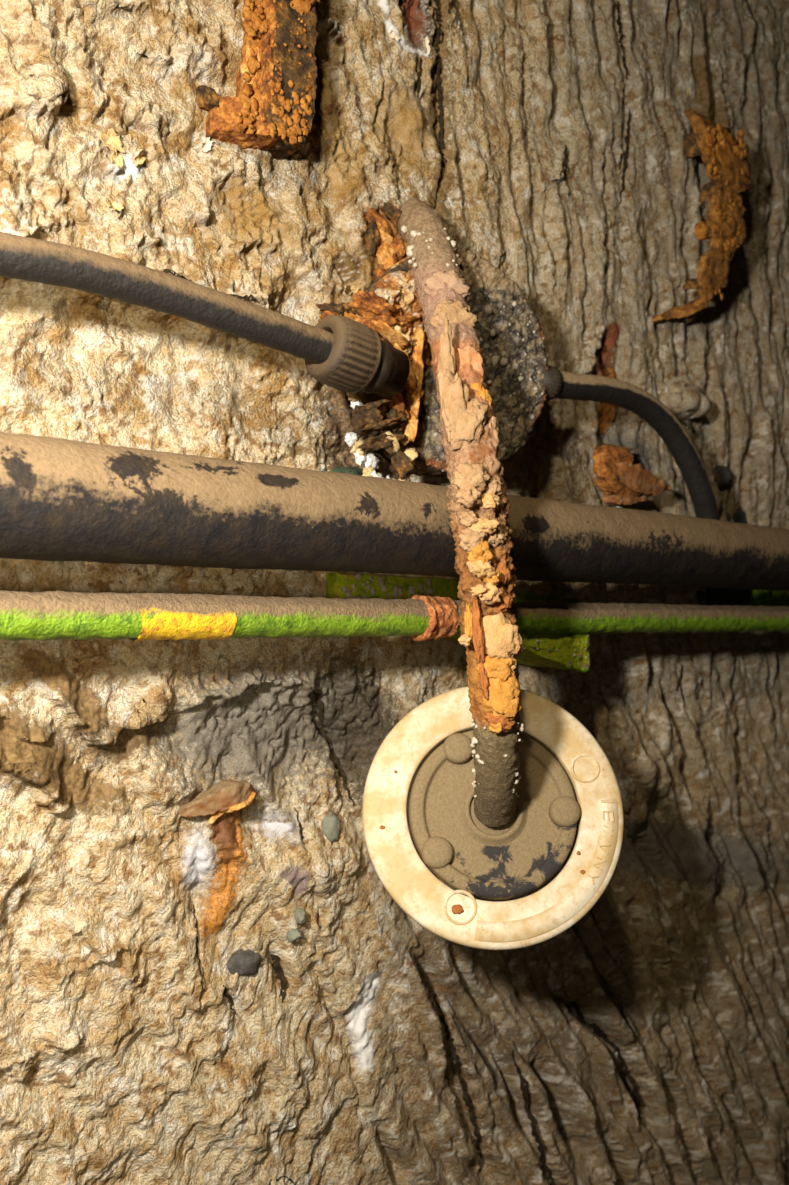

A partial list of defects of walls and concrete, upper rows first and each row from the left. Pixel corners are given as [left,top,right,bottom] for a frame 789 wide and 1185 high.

corrosion [195,0,322,160]
corrosion [597,402,617,433]
corrosion [596,323,621,379]
corrosion [198,791,256,942]